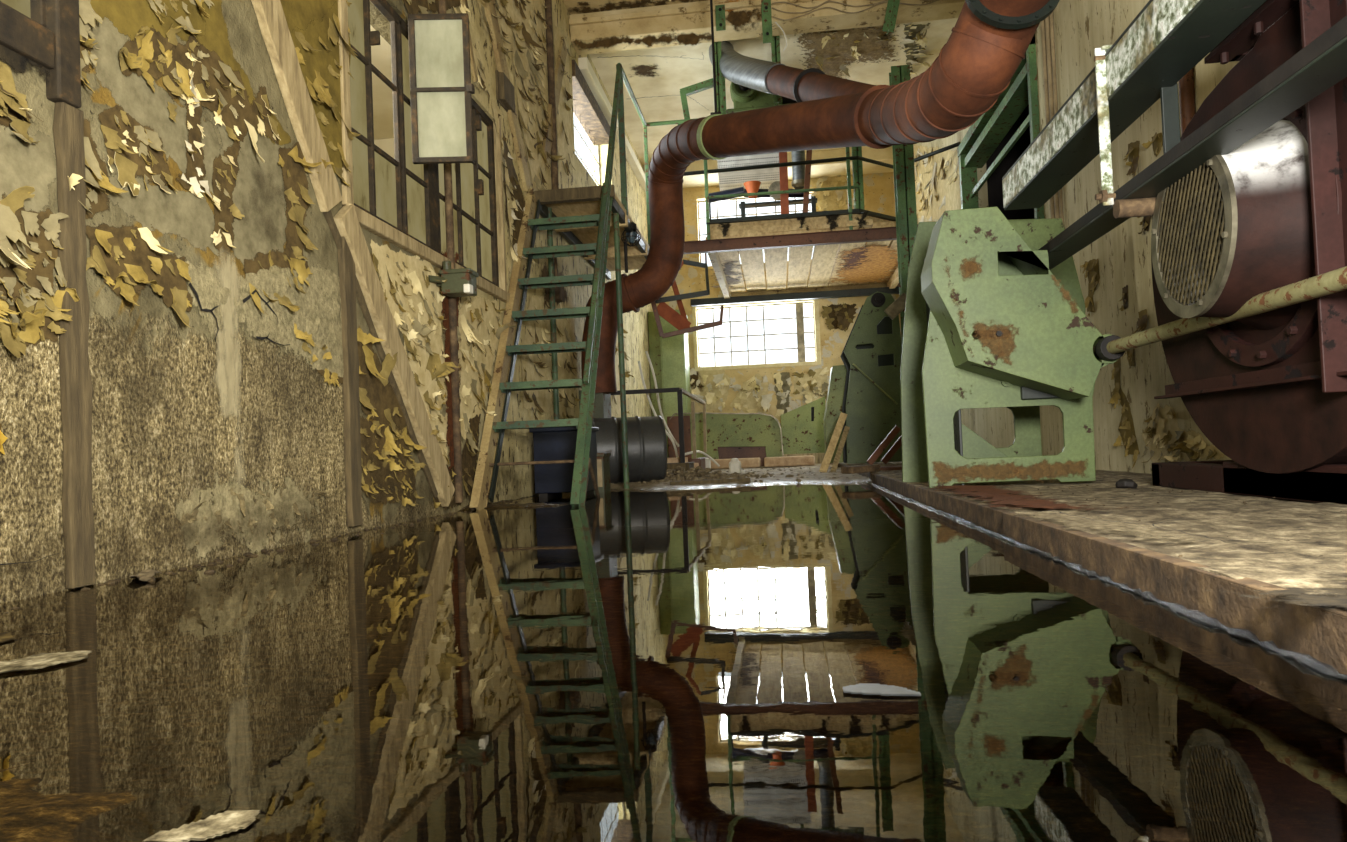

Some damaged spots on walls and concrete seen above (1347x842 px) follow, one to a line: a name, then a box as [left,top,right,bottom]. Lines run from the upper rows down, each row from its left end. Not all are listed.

peeling [1124,132,1163,177]
peeling [1137,216,1151,234]
flaking render [0,0,580,510]
peeling [1080,259,1100,316]
peeling [1119,285,1148,333]
peeling [1108,349,1224,468]